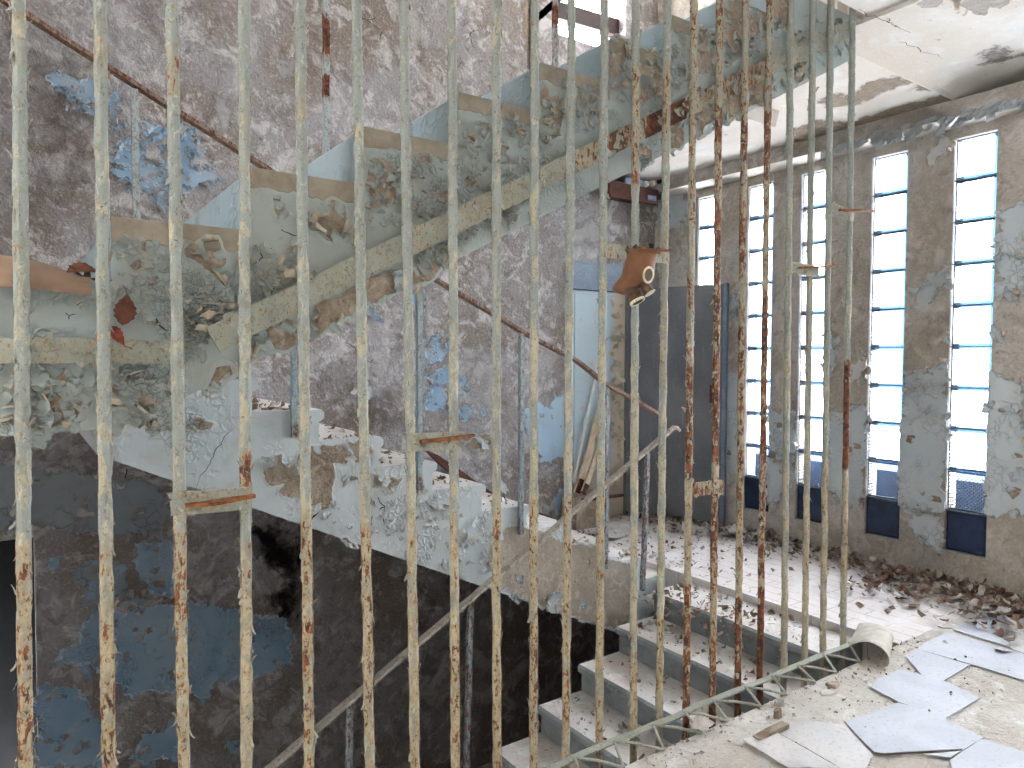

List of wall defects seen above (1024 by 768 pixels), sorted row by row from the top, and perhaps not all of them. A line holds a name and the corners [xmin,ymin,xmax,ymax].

crack [859,9,939,56]
peeling [108,89,225,222]
peeling [364,0,849,231]
peeling [110,194,527,400]
peeling [0,462,16,536]
peeling [31,467,295,706]
peeling [111,363,217,438]
water stain [251,523,301,620]
peeling [259,438,630,631]
peeling [897,357,953,555]
peeling [980,370,1024,519]
peeling [33,682,102,768]